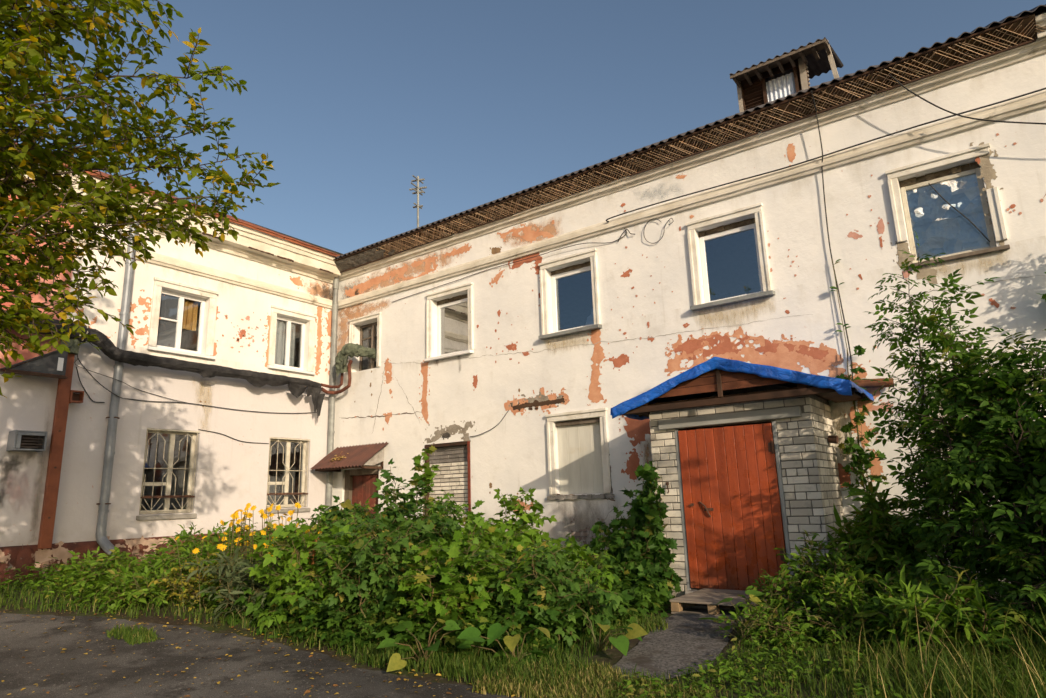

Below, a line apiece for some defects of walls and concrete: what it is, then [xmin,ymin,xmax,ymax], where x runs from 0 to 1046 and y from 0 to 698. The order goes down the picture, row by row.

peeling [344,243,472,297]
peeling [489,220,556,288]
peeling [117,289,161,348]
peeling [585,263,654,406]
spalling [419,360,476,445]
spalling [502,387,570,416]
crack [346,314,813,433]
peeling [664,323,893,482]
damp [0,457,20,503]
peeling [618,415,651,483]
peeling [33,541,80,576]
peeling [107,534,172,555]